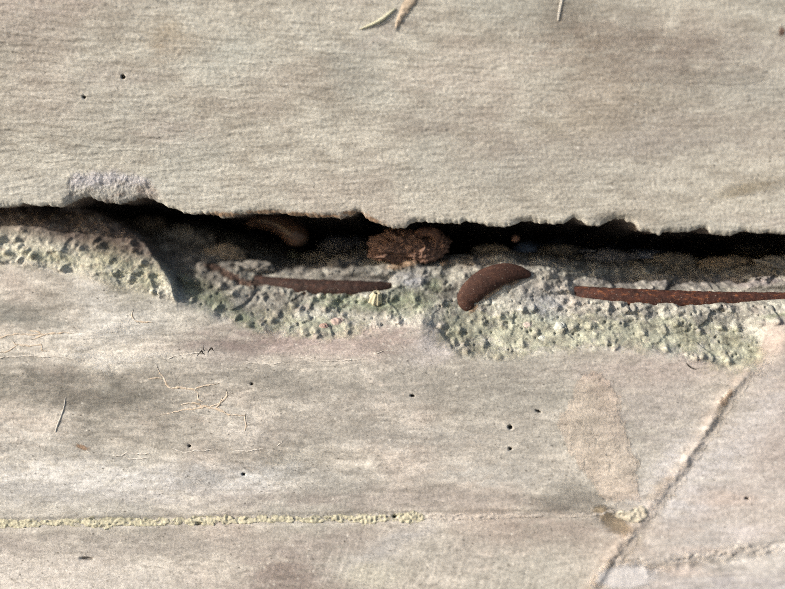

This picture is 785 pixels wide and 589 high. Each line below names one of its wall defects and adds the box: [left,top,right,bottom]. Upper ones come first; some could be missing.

spalling [0,170,785,370]
corrosion [384,259,424,270]